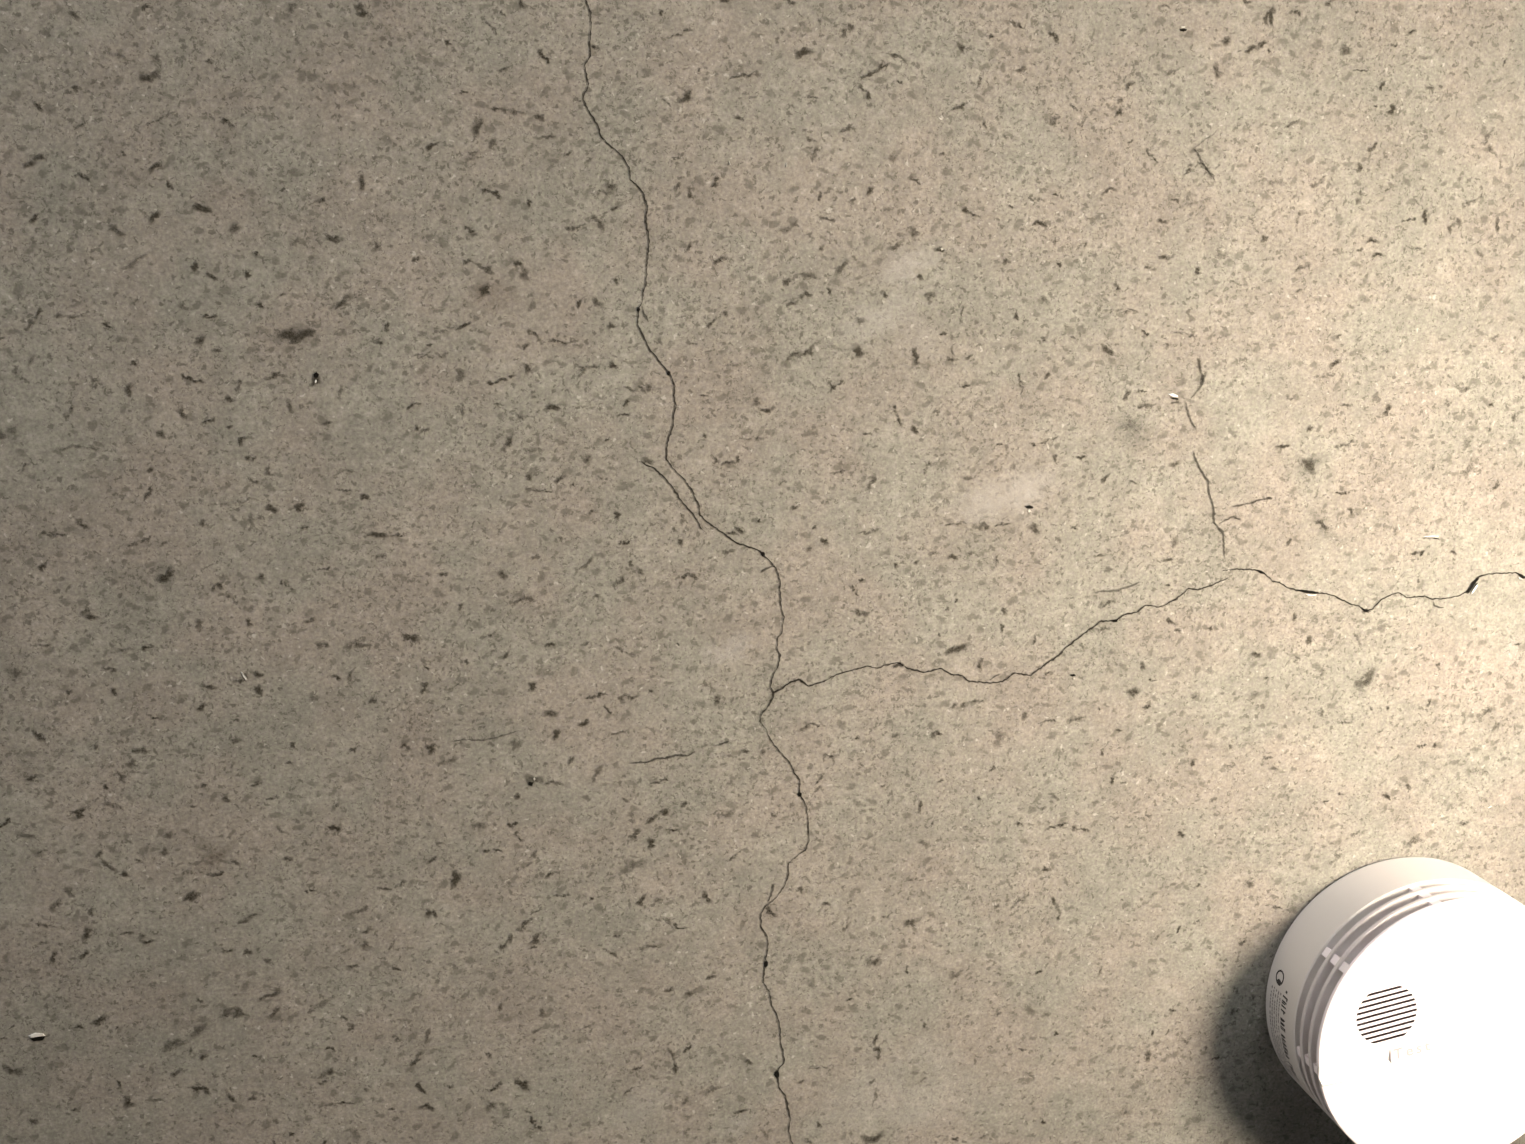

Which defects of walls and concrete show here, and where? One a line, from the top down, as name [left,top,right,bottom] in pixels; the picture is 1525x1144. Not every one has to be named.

crack [579,0,1525,1144]